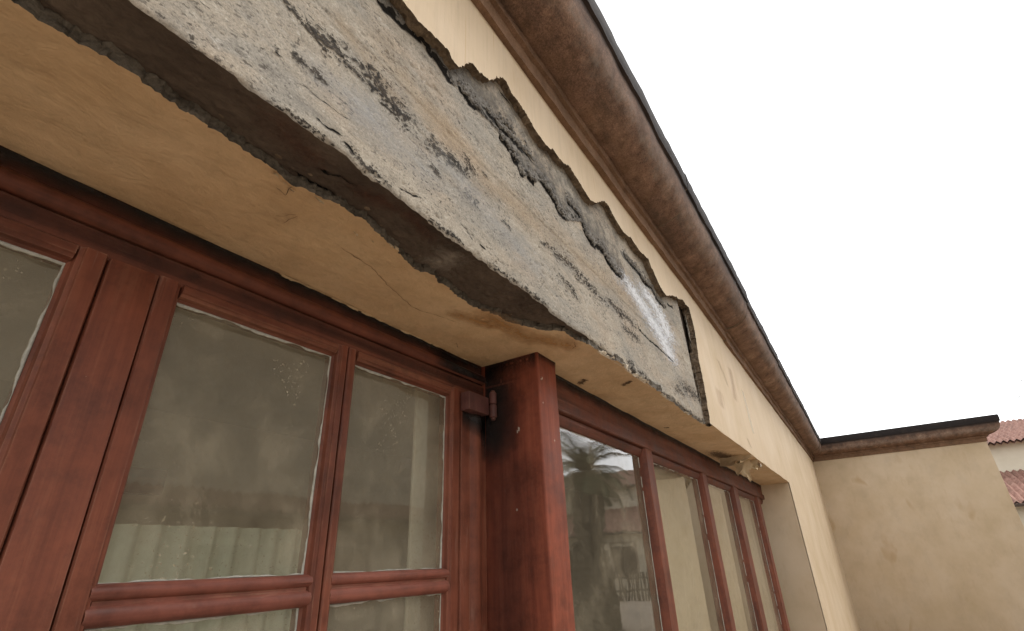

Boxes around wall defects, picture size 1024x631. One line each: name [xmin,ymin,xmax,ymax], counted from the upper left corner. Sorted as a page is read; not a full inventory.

spalling [12,0,710,427]
crack [377,0,692,363]